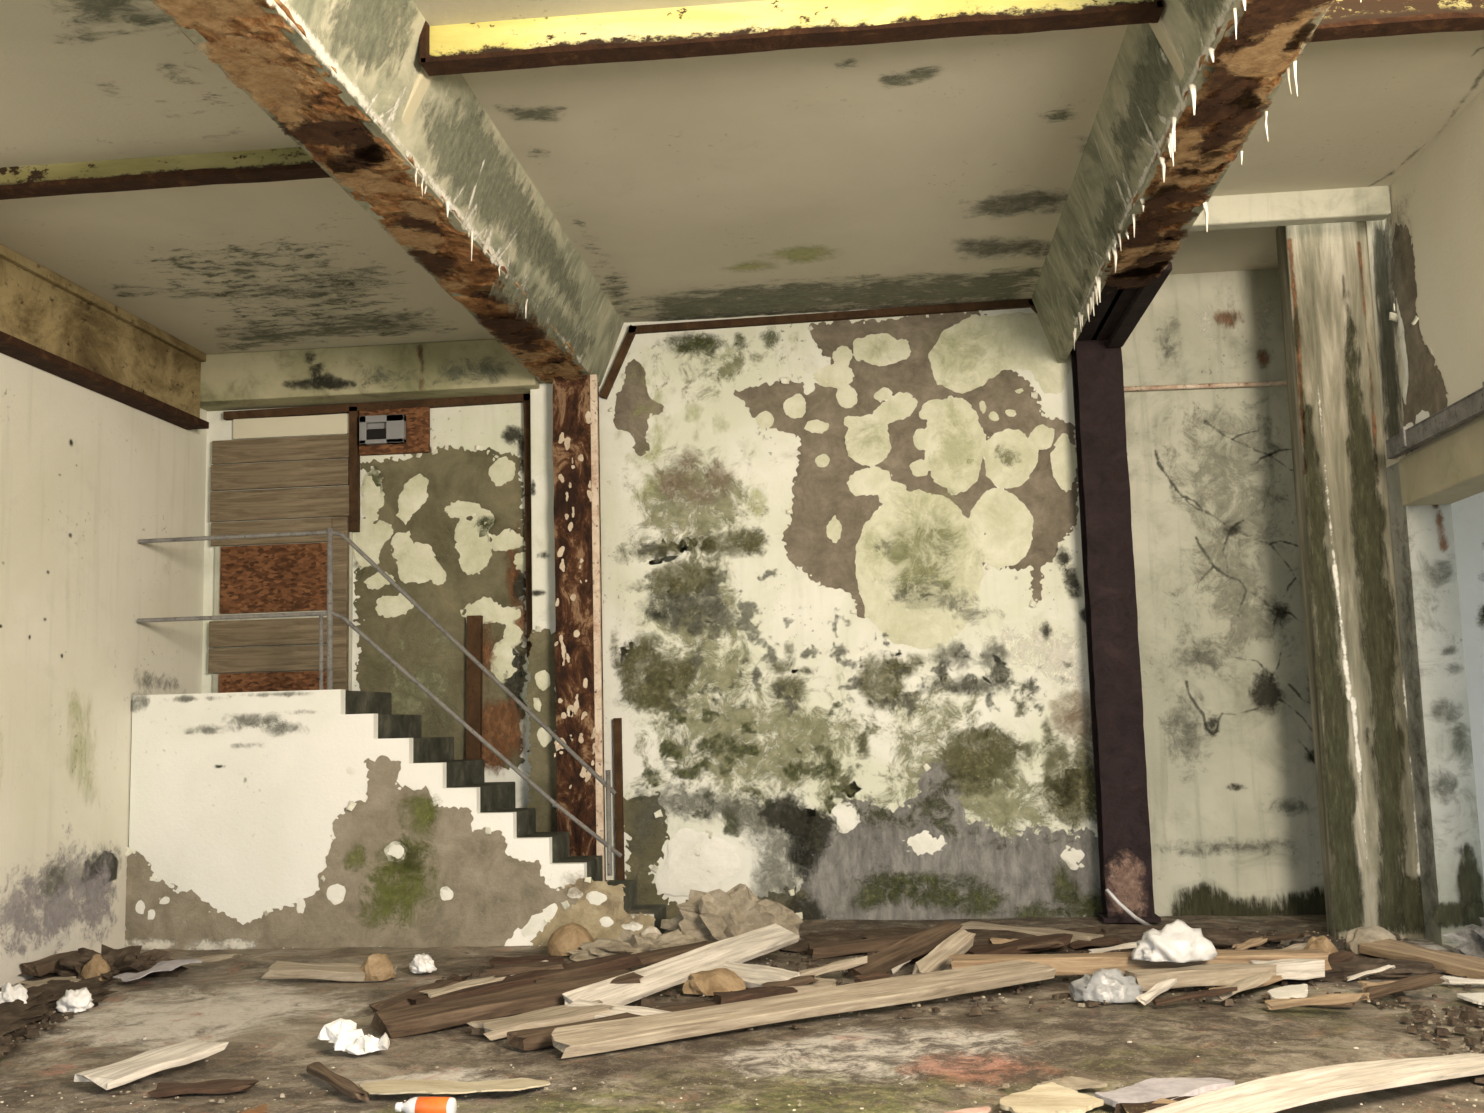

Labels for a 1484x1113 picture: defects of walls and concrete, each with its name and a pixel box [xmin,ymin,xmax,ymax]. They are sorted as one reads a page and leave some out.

damp [151,241,429,389]
damp [1373,221,1403,439]
peeling [1389,223,1448,426]
damp [125,938,255,950]
peeling [125,755,689,950]
peeling [353,432,596,832]
damp [611,530,764,711]
damp [636,625,1102,920]
damp [1056,549,1086,623]
damp [1170,407,1290,669]
damp [1249,672,1282,711]
damp [1325,470,1369,790]